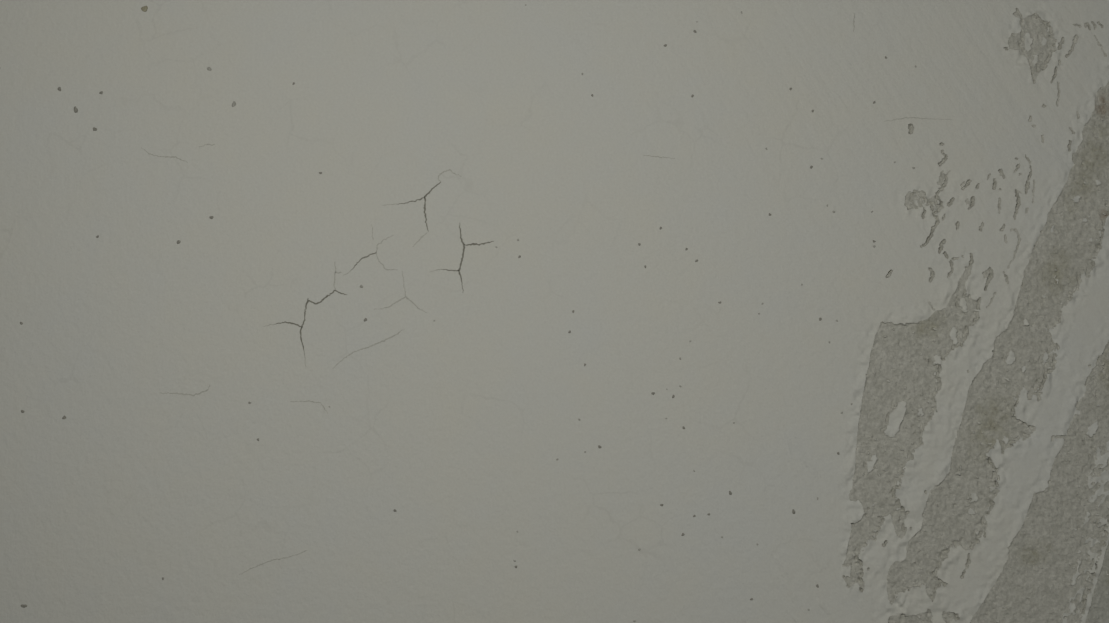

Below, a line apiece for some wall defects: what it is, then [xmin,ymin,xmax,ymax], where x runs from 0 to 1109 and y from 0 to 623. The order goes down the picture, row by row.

peeling [1004,8,1107,108]
crack [263,169,462,366]
crack [431,225,494,291]
peeling [842,82,1109,623]